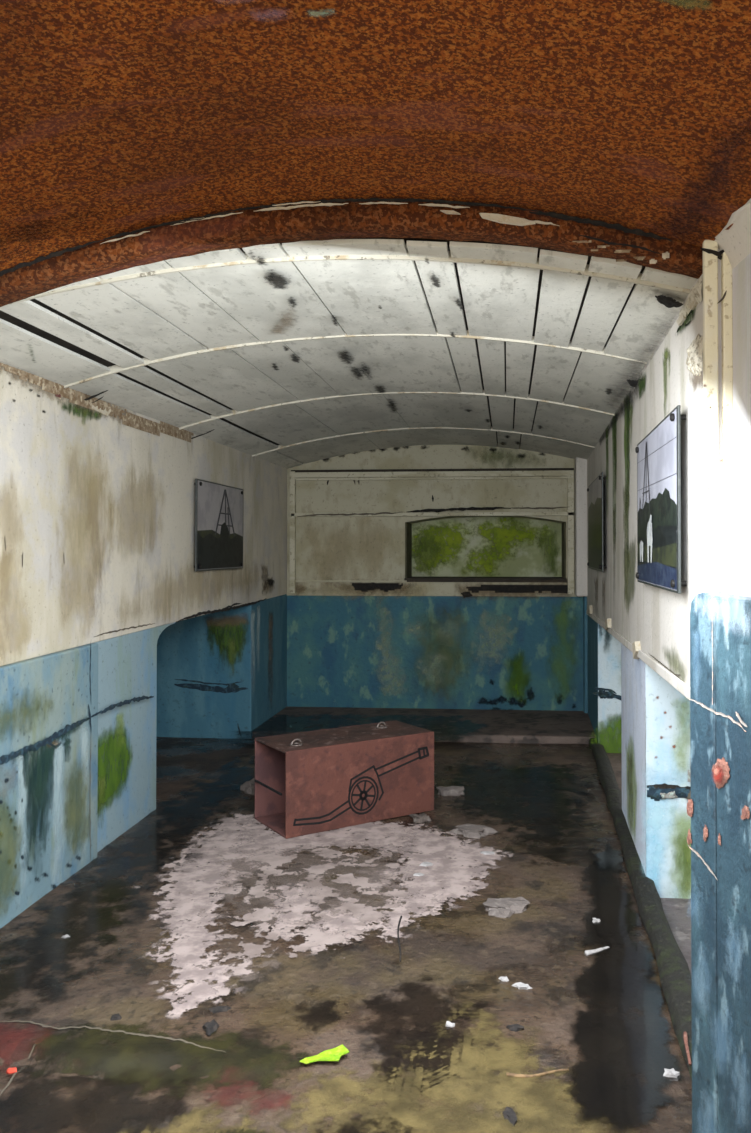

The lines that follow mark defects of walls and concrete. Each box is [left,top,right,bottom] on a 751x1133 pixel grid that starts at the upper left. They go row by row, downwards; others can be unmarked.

peeling [174,201,559,226]
peeling [572,240,669,264]
water stain [600,326,671,552]
water stain [478,687,534,710]
water stain [0,714,487,1018]
water stain [296,1001,341,1029]
water stain [361,977,487,1093]
water stain [339,1117,411,1133]